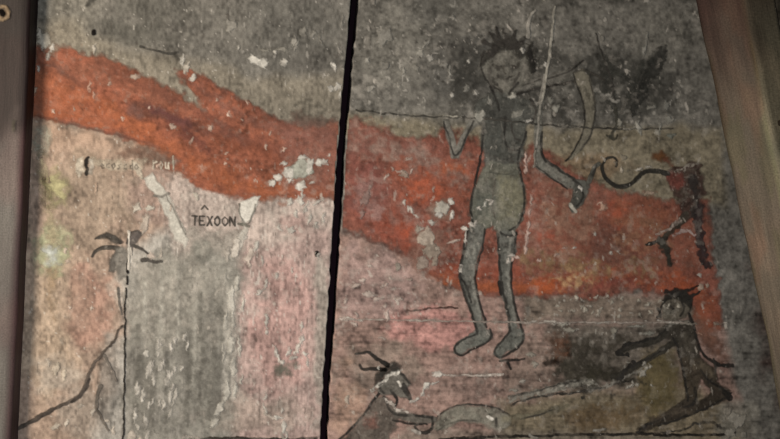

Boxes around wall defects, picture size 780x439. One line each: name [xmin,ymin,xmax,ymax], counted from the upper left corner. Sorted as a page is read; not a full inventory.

peeling [269,154,330,228]
crack [182,0,685,439]
peeling [403,198,477,269]